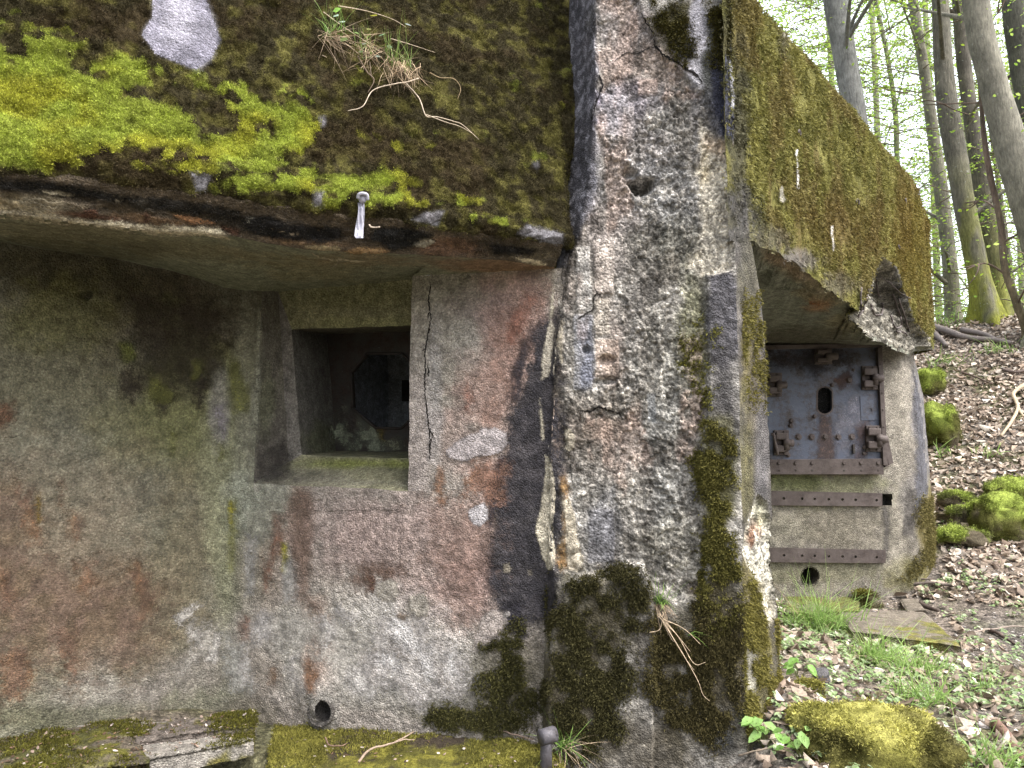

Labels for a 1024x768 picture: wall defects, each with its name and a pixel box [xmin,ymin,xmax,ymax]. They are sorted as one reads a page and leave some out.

crack [591,13,702,121]
spalling [855,257,933,355]
crack [422,284,434,459]
corrosion [765,349,855,390]
water stain [484,295,583,639]